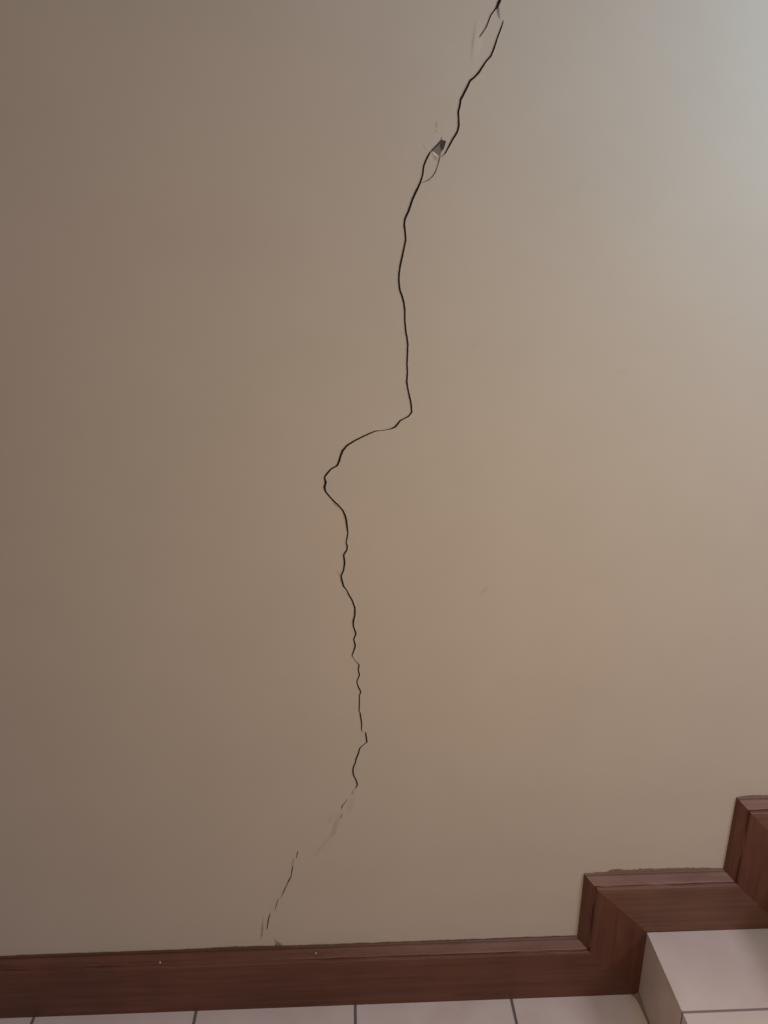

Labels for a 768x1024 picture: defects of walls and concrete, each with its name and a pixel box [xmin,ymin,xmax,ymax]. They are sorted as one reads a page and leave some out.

crack [322,0,505,808]